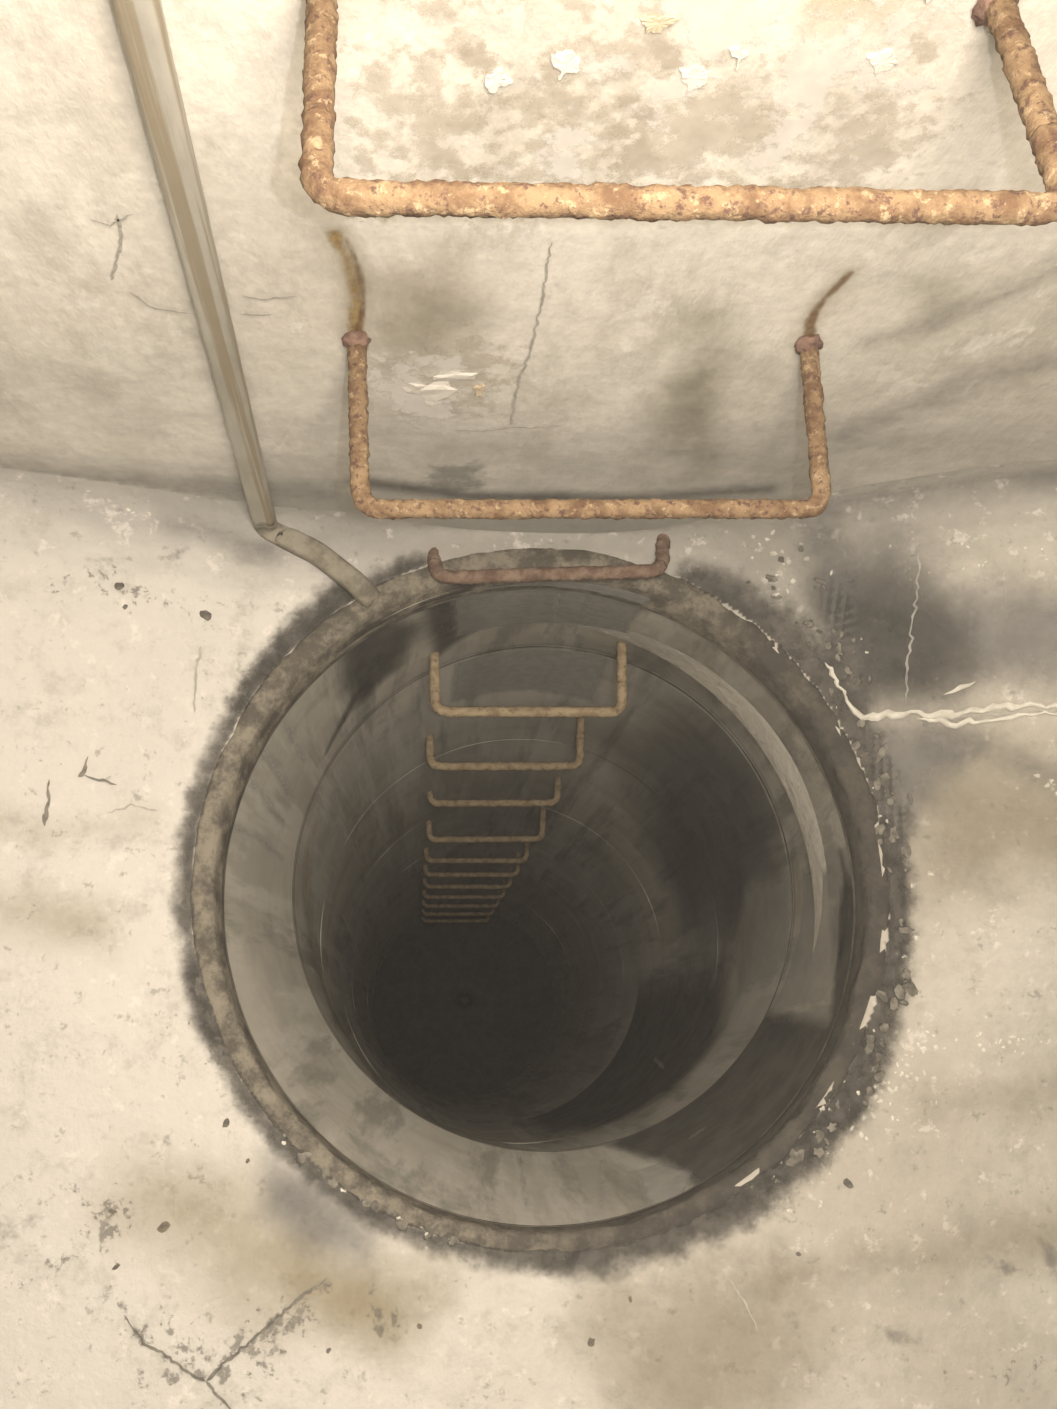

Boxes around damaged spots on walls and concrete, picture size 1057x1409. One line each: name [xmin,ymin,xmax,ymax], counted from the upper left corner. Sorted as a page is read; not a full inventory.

corrosion [330,232,364,331]
crack [825,540,1057,729]
leakage [174,544,1057,1277]
crack [124,1278,327,1409]